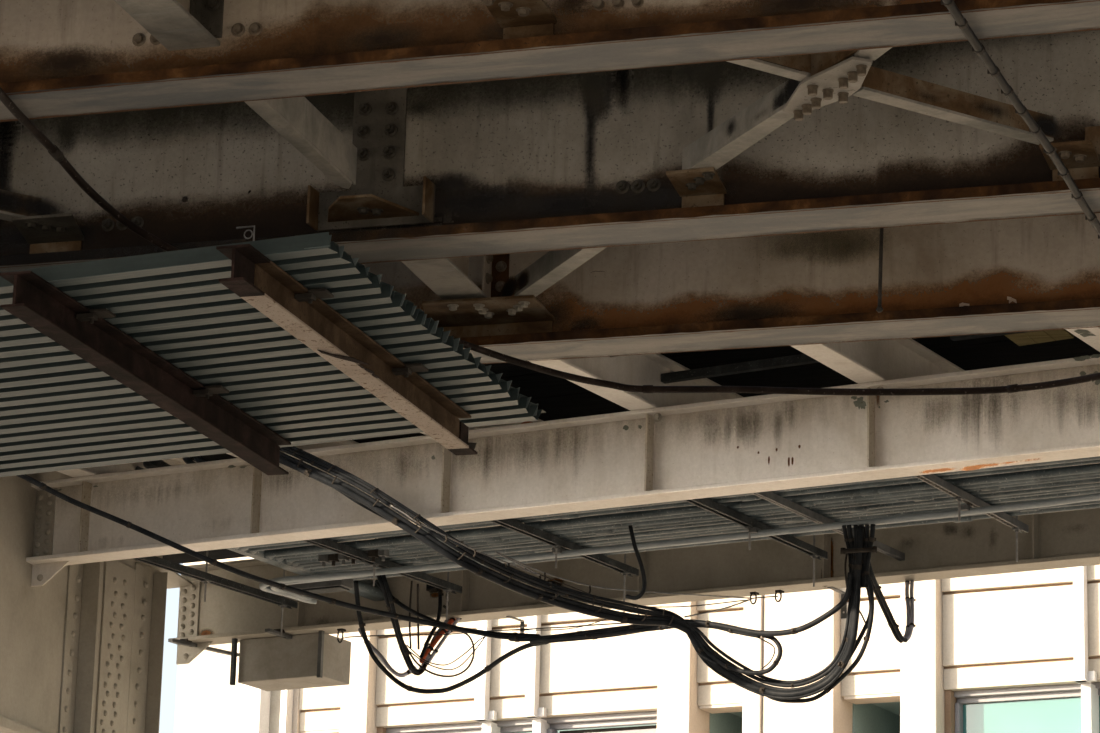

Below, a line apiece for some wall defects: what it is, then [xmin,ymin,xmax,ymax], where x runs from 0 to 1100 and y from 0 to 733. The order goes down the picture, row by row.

corrosion [0,0,941,83]
corrosion [0,121,1100,268]
corrosion [482,269,1100,347]
corrosion [535,326,1100,361]